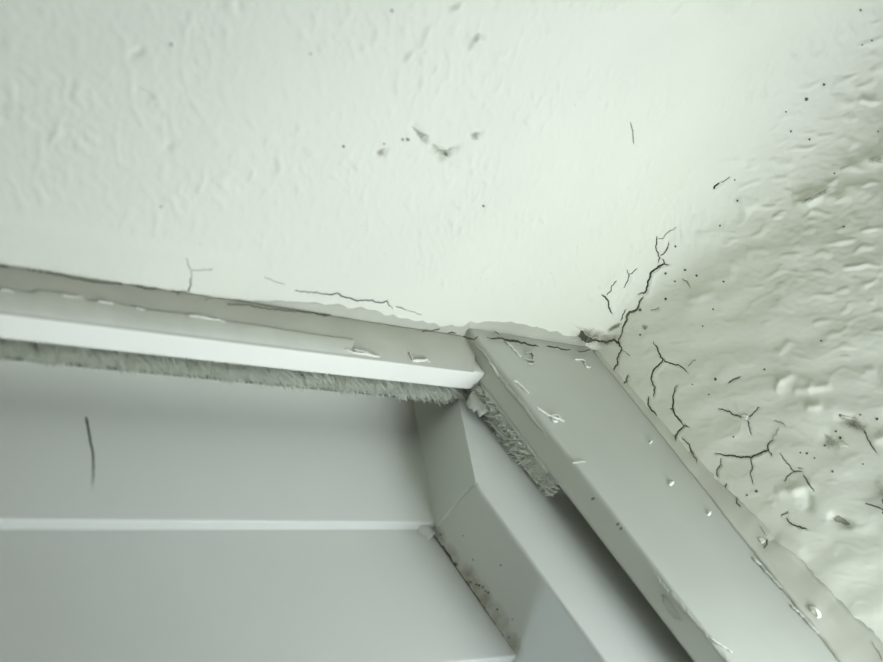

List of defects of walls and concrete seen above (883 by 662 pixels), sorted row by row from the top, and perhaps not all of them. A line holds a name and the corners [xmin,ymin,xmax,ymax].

peeling [0,288,380,358]
crack [0,227,676,384]
peeling [536,407,565,423]
crack [647,342,814,507]
peeling [790,604,821,634]